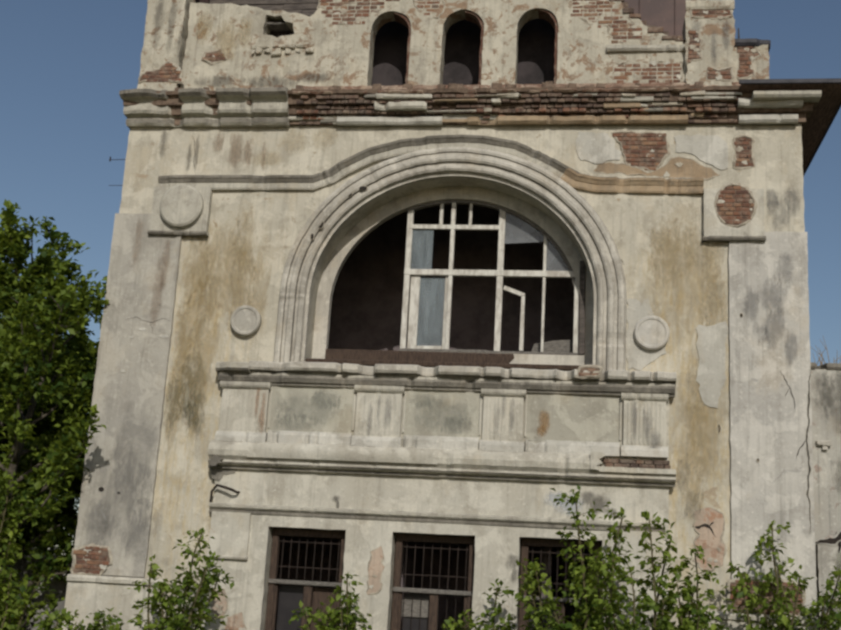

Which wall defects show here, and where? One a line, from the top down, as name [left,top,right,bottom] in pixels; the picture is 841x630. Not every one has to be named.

flaking render [317,0,400,25]
flaking render [413,0,445,19]
flaking render [571,0,642,44]
flaking render [138,61,184,84]
flaking render [593,130,720,181]
flaking render [732,134,755,171]
flaking render [714,183,758,228]
crack [781,372,841,552]
flaking render [70,543,113,576]
peeling [366,546,385,595]
peeling [692,507,727,572]
peeling [208,588,247,630]